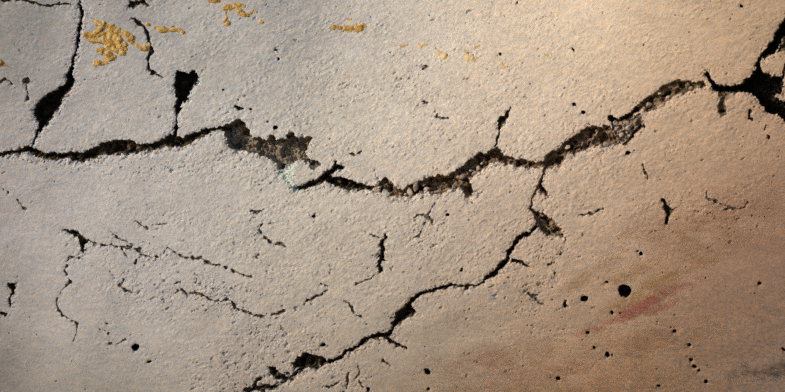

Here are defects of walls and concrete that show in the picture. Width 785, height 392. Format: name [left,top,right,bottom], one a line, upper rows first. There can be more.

crack [0,0,230,166]
crack [747,108,770,139]
crack [706,191,749,211]
crack [56,79,706,392]
crack [0,282,17,317]